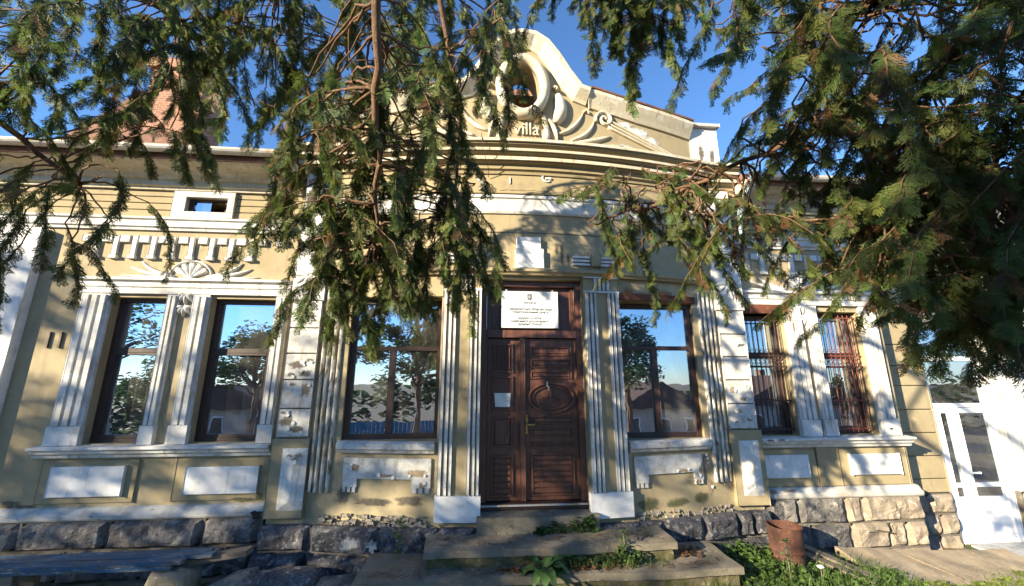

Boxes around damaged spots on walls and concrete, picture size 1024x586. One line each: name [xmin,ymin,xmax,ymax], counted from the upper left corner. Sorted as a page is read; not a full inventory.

peeling [287,358,313,397]
peeling [280,410,302,433]
peeling [408,470,426,489]
spalling [637,453,733,521]